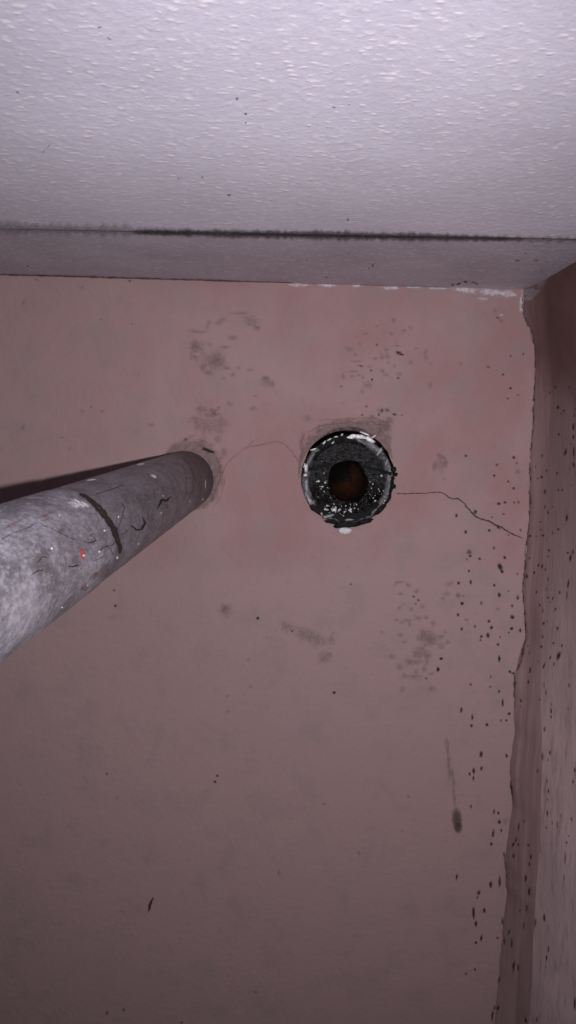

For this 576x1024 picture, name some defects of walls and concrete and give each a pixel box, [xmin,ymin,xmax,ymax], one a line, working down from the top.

crack [397,381,535,698]